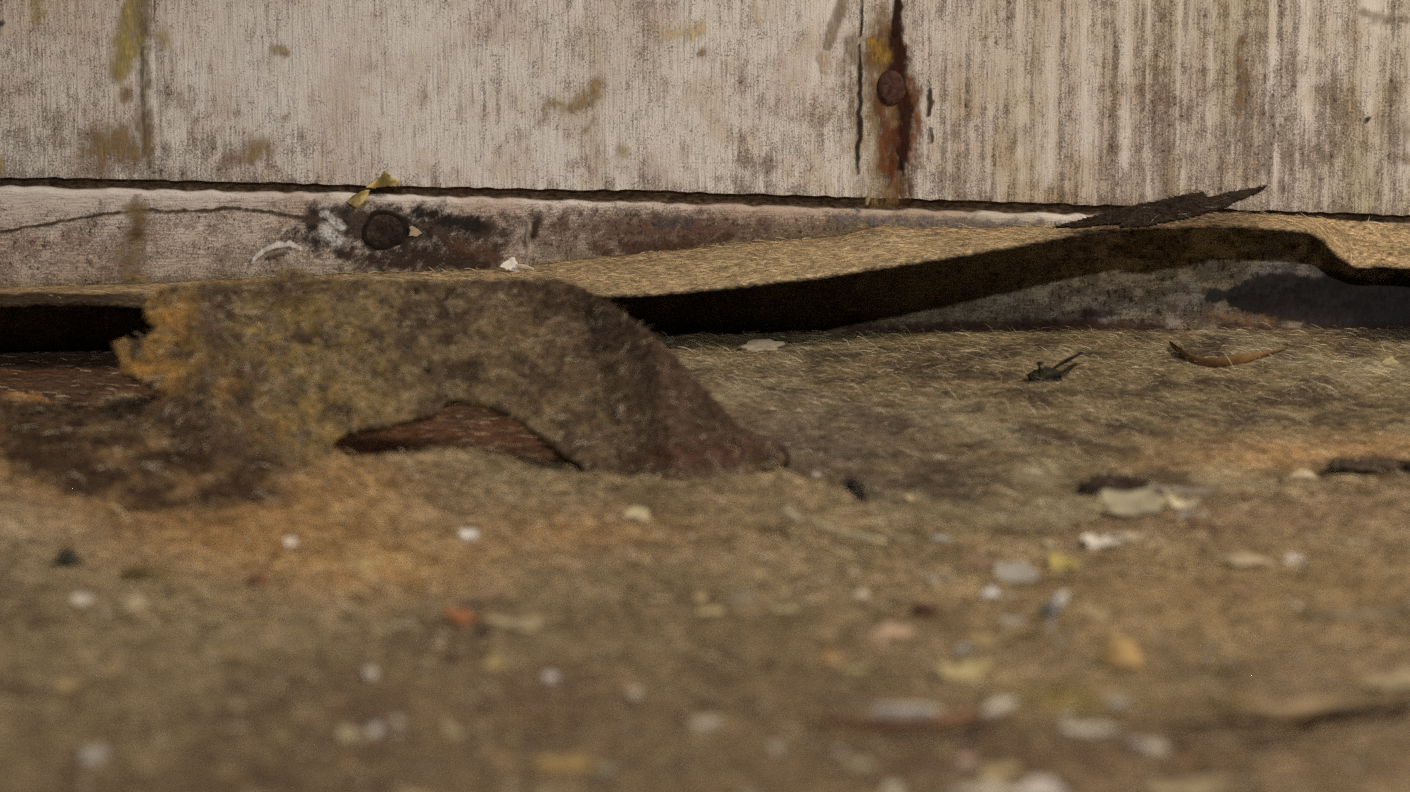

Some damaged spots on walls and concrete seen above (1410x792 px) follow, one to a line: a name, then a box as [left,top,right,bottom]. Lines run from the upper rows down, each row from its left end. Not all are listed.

corrosion [854,1,922,204]
peeling [817,307,1185,334]
peeling [1208,313,1317,330]